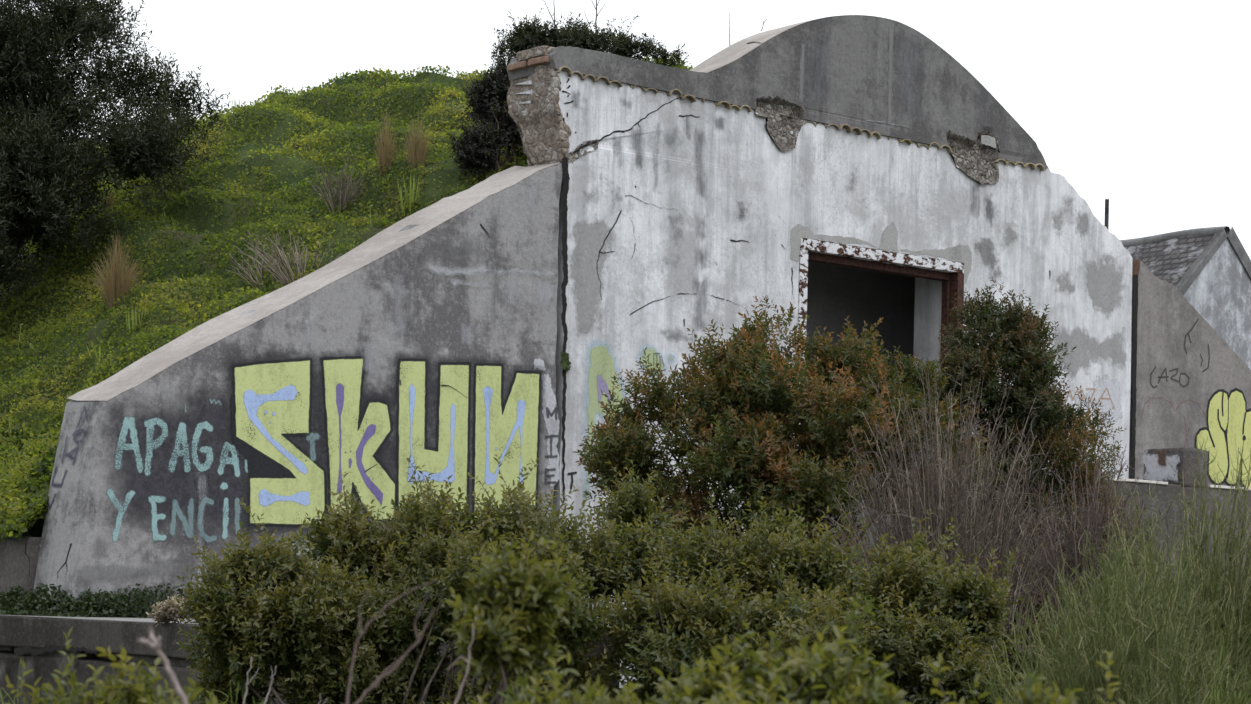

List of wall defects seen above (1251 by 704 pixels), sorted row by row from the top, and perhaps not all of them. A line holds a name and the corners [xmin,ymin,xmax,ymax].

spalling [507,64,599,166]
spalling [755,96,804,152]
spalling [947,130,1000,184]
peeling [1054,199,1088,234]
peeling [790,221,1017,283]
crack [561,98,700,499]
crack [630,293,747,315]